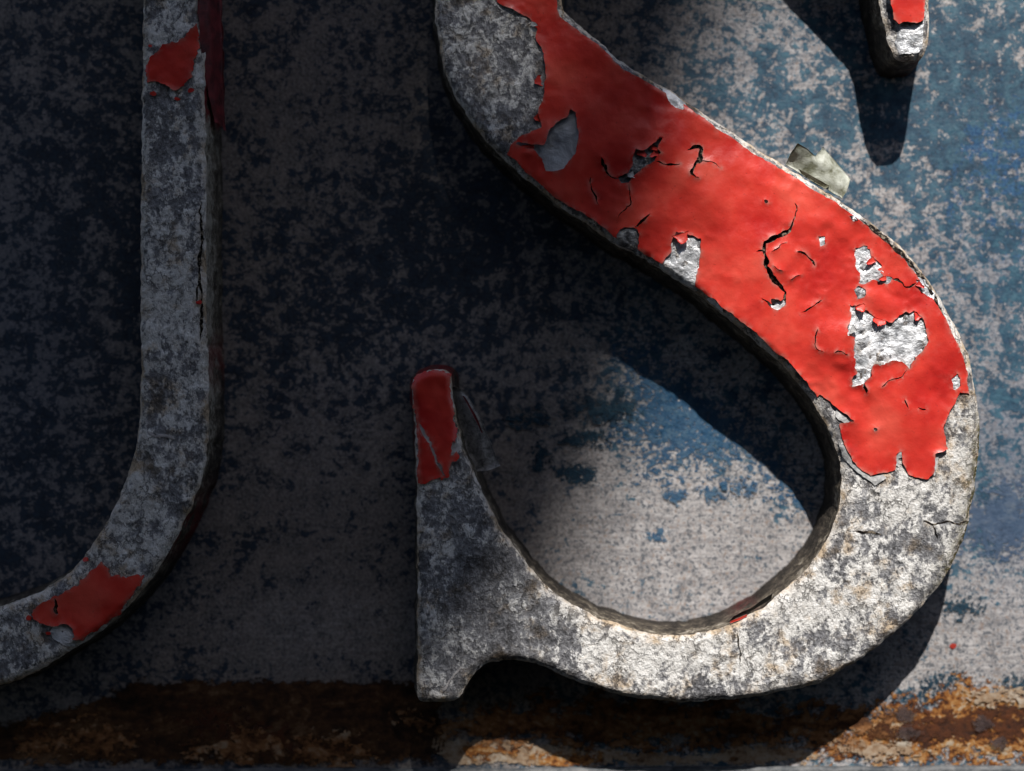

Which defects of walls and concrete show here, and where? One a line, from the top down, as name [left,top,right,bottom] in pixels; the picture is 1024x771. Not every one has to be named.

peeling [438,0,579,171]
peeling [662,88,686,110]
peeling [895,22,924,54]
crack [589,158,649,228]
crack [657,137,717,177]
peeling [785,143,850,199]
crack [196,202,204,340]
peeling [659,231,701,291]
crack [756,204,847,355]
peeling [847,246,928,387]
peeling [504,327,824,523]
rust [0,672,1024,767]